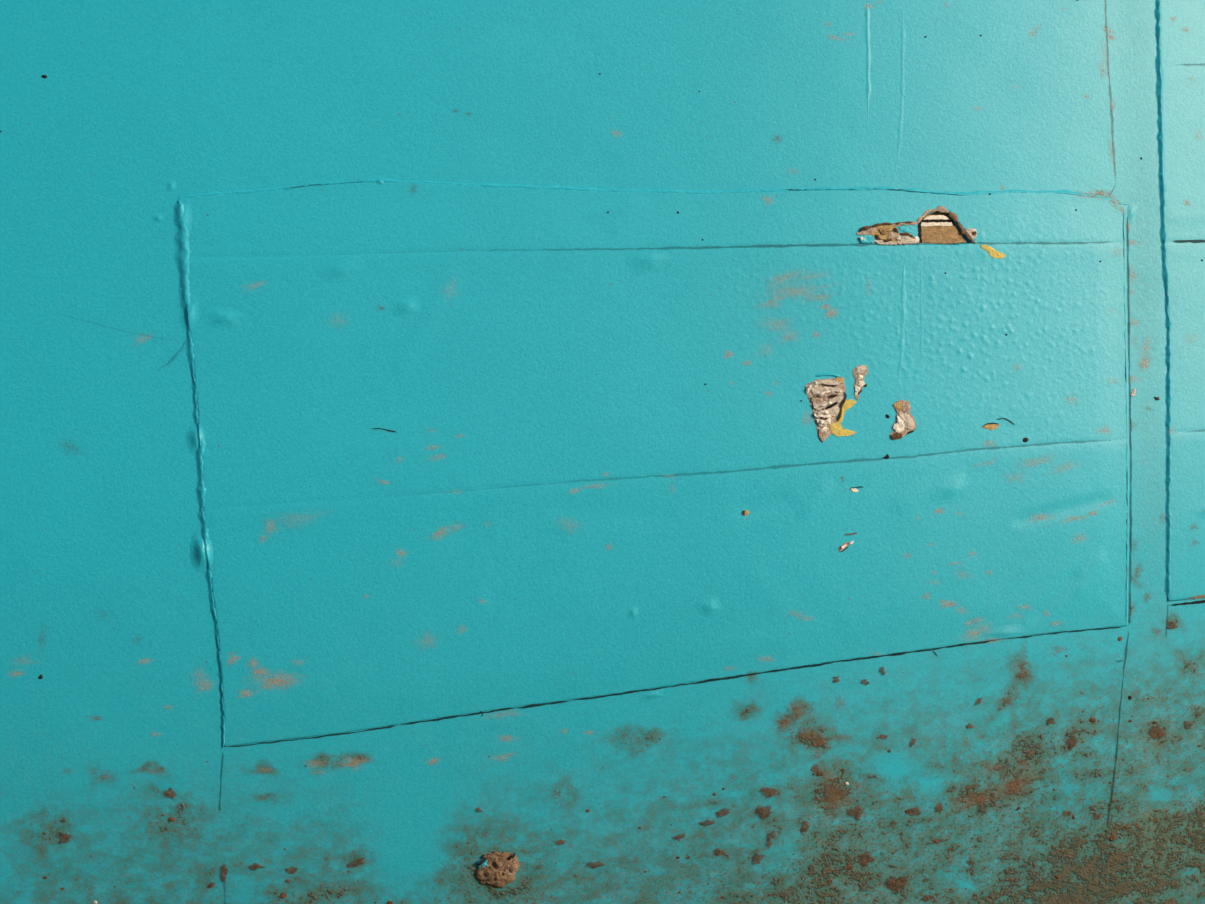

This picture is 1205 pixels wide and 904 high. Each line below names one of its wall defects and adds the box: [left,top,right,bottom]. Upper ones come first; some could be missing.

peeling [856,206,1006,259]
peeling [806,365,868,442]
peeling [890,400,916,440]
rust [474,851,520,888]